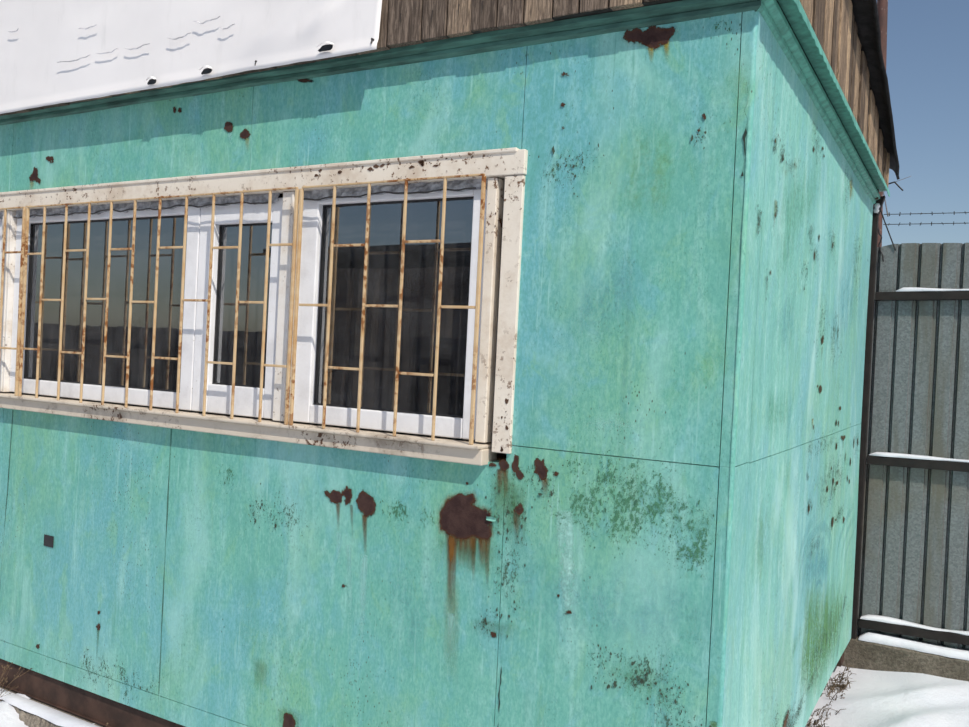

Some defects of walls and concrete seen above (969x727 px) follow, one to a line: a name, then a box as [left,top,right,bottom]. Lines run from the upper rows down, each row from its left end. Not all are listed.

corrosion [623,26,675,53]
corrosion [489,454,559,483]
corrosion [324,486,376,534]
corrosion [439,482,492,580]
corrosion [283,713,296,727]